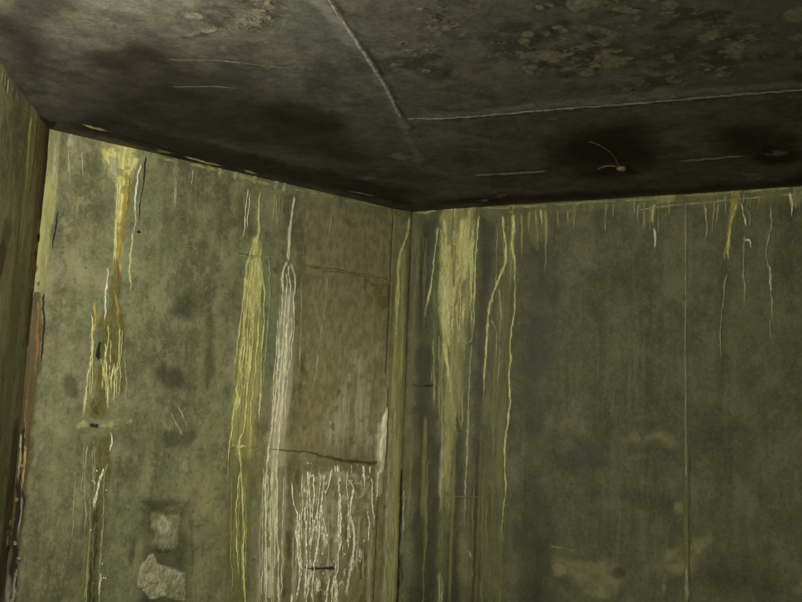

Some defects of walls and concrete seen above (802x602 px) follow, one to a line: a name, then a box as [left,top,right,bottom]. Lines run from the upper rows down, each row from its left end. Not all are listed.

damp [190,164,224,185]
rust [0,104,50,602]
damp [72,433,113,602]
spalling [137,513,187,601]
crack [231,444,376,475]
damp [224,172,802,602]